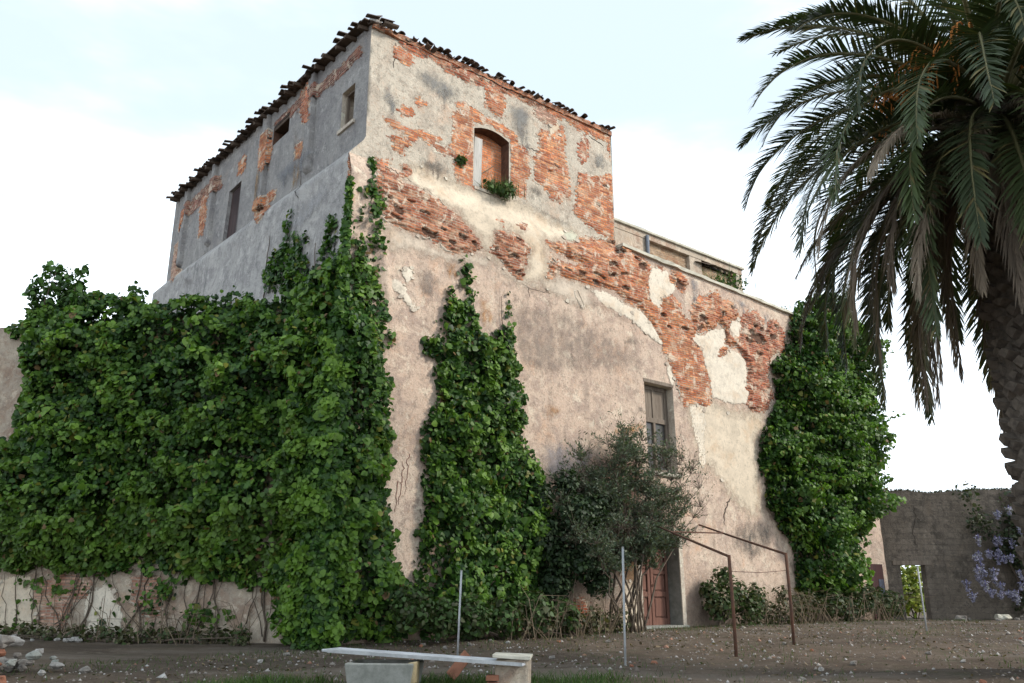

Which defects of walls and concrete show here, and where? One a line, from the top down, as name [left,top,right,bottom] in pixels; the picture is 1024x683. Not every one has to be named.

flaking render [299,82,311,125]
flaking render [236,127,273,176]
flaking render [252,189,277,224]
spalling [374,78,786,516]
crack [394,454,410,510]